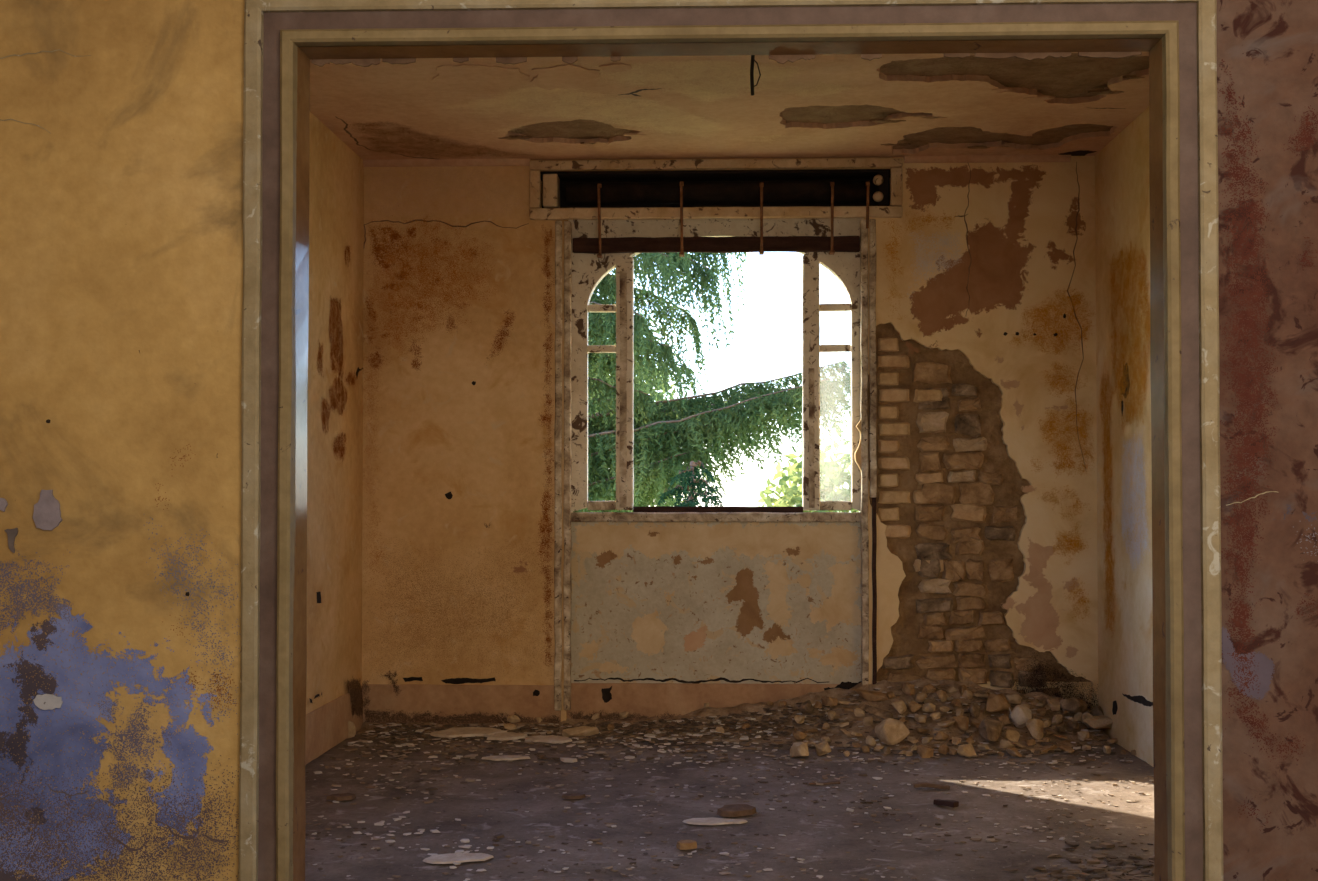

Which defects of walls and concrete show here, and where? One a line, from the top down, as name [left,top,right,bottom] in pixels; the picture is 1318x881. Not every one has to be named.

peeling [312,58,416,67]
peeling [944,52,1141,61]
spalling [499,119,643,144]
spalling [572,104,1113,696]
water stain [1007,242,1150,621]
flaking render [33,490,62,530]
peeling [0,528,219,881]